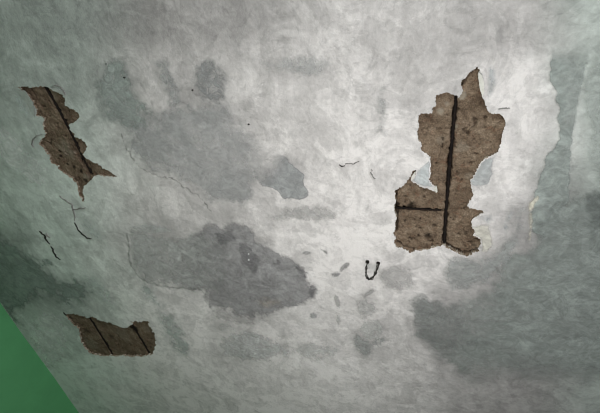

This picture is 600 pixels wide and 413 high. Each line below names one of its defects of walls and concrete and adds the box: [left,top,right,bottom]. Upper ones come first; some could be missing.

spalling [17,86,117,202]
water stain [97,61,252,202]
spalling [393,67,506,257]
crack [39,231,61,260]
crack [59,195,92,239]
spalling [65,314,156,357]
water stain [128,223,315,324]
water stain [414,299,446,336]
water stain [442,57,600,371]